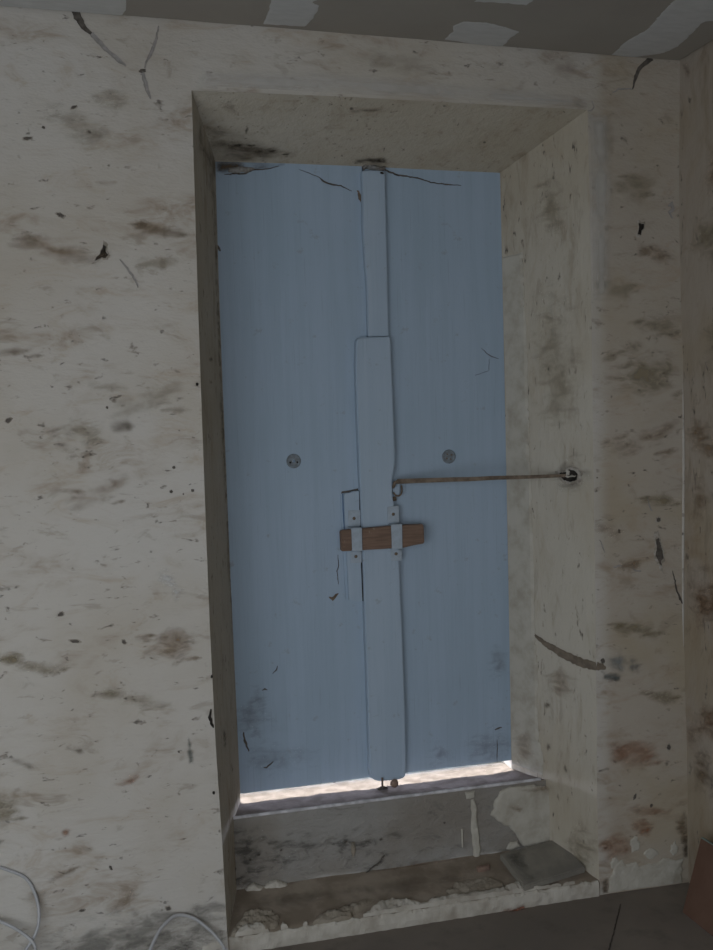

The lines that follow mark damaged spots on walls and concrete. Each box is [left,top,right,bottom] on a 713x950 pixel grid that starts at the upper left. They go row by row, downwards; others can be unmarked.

crack [72,12,159,99]
crack [587,58,653,111]
crack [224,166,351,191]
crack [385,169,461,186]
peeling [490,784,550,851]
flaking render [229,836,688,950]